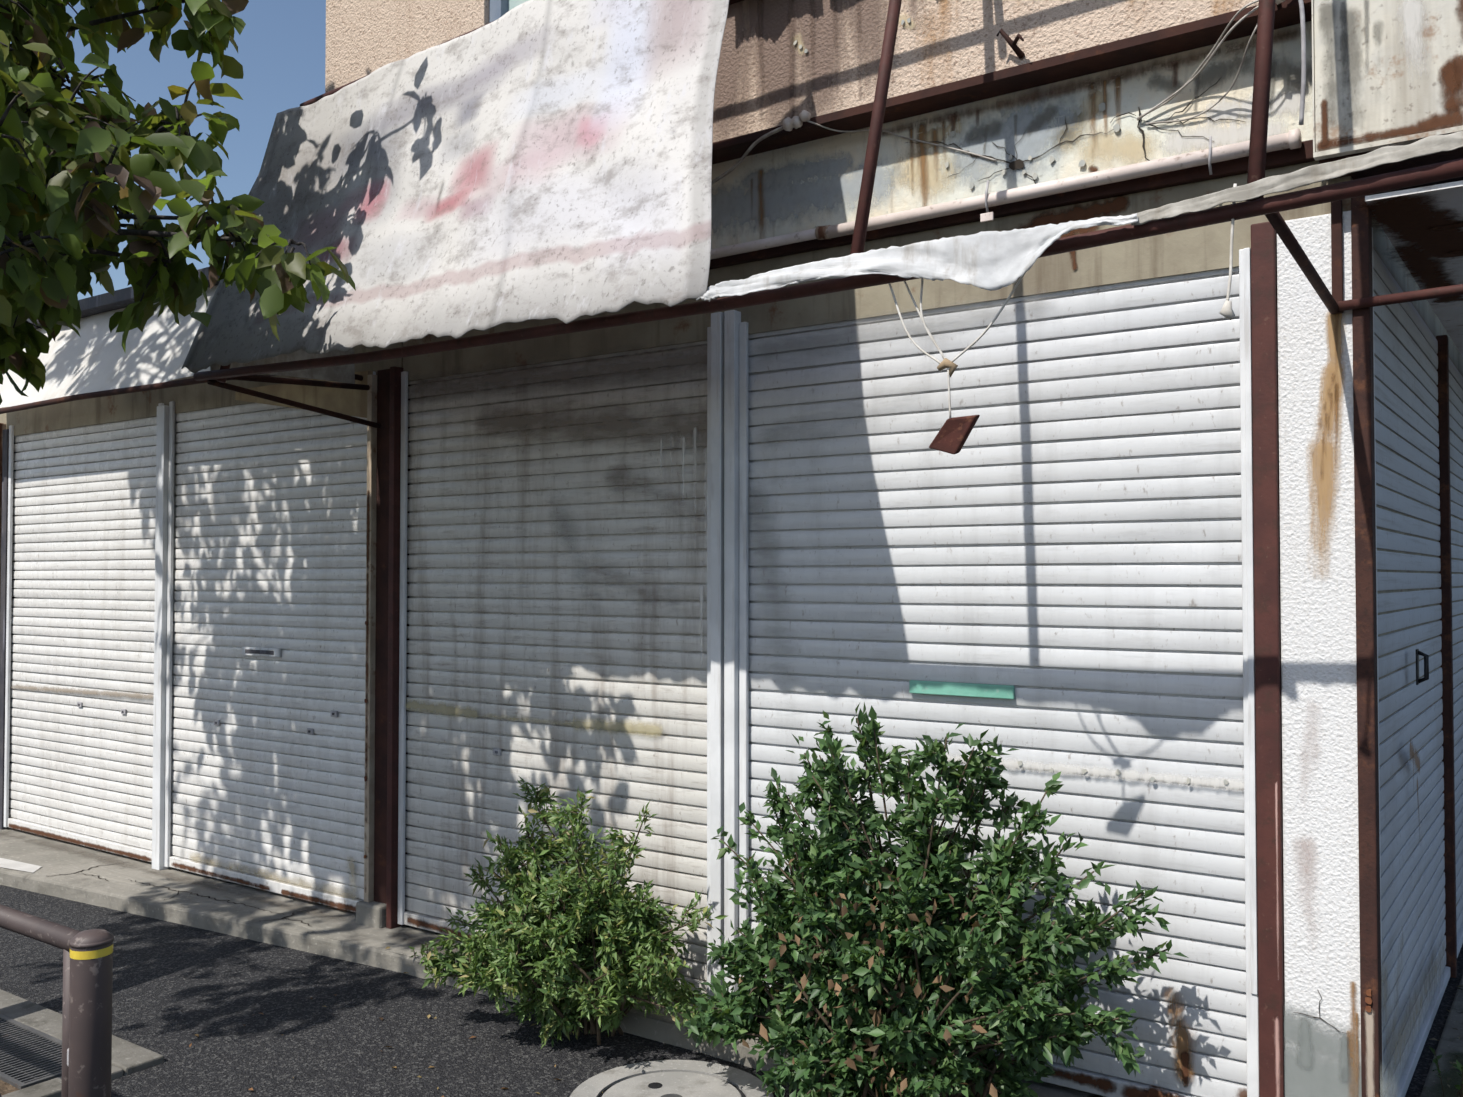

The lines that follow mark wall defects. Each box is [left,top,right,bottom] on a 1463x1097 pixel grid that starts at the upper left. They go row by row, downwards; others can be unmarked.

crack [906,78,1245,184]
rust [1317,55,1463,151]
rust [1019,195,1128,270]
rust [1312,312,1343,549]
rust [1033,991,1192,1097]
rust [1347,982,1358,1096]